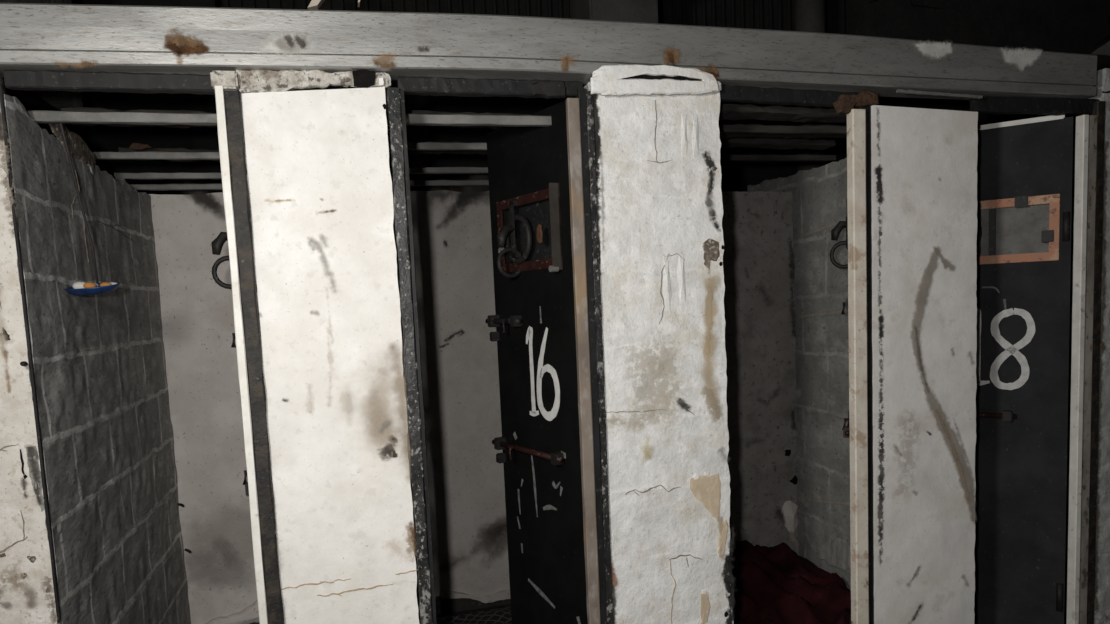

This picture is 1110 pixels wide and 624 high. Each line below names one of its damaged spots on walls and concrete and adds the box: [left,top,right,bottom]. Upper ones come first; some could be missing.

rust [165,32,208,63]
rust [663,47,679,66]
peeling [916,43,952,58]
peeling [1002,49,1042,70]
damp [703,278,720,419]
damp [396,378,407,418]
damp [380,435,409,458]
crack [625,484,678,495]
peeling [690,472,735,624]
crack [281,569,418,597]